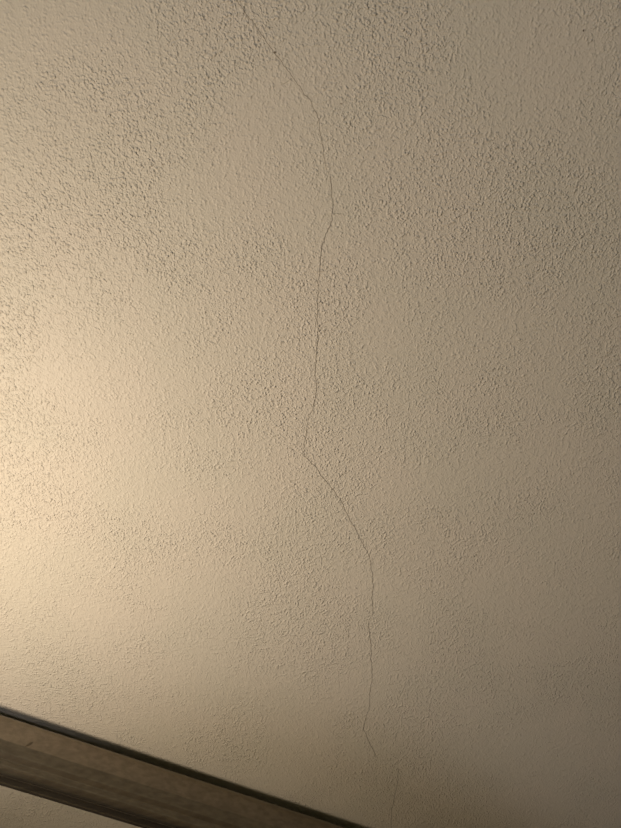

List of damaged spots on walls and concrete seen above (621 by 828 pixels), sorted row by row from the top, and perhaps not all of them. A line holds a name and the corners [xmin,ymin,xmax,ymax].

crack [236,0,374,662]